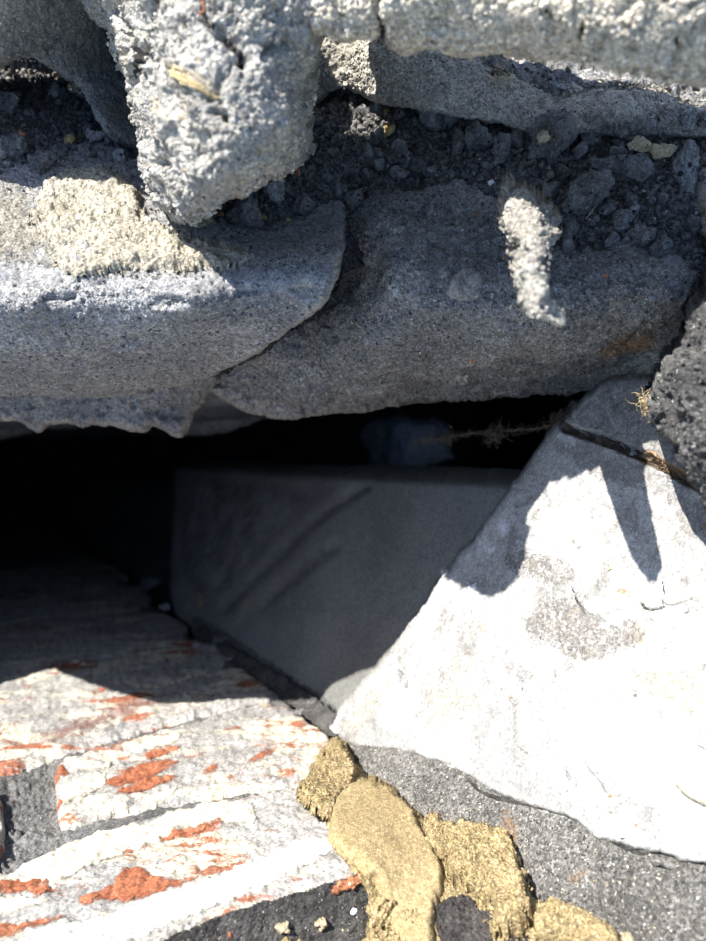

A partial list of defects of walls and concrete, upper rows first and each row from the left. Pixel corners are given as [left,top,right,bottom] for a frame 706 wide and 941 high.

crack [640,581,665,611]
peeling [106,745,179,794]
peeling [0,764,69,896]
peeling [150,817,221,844]
peeling [79,866,197,905]
peeling [0,914,63,936]